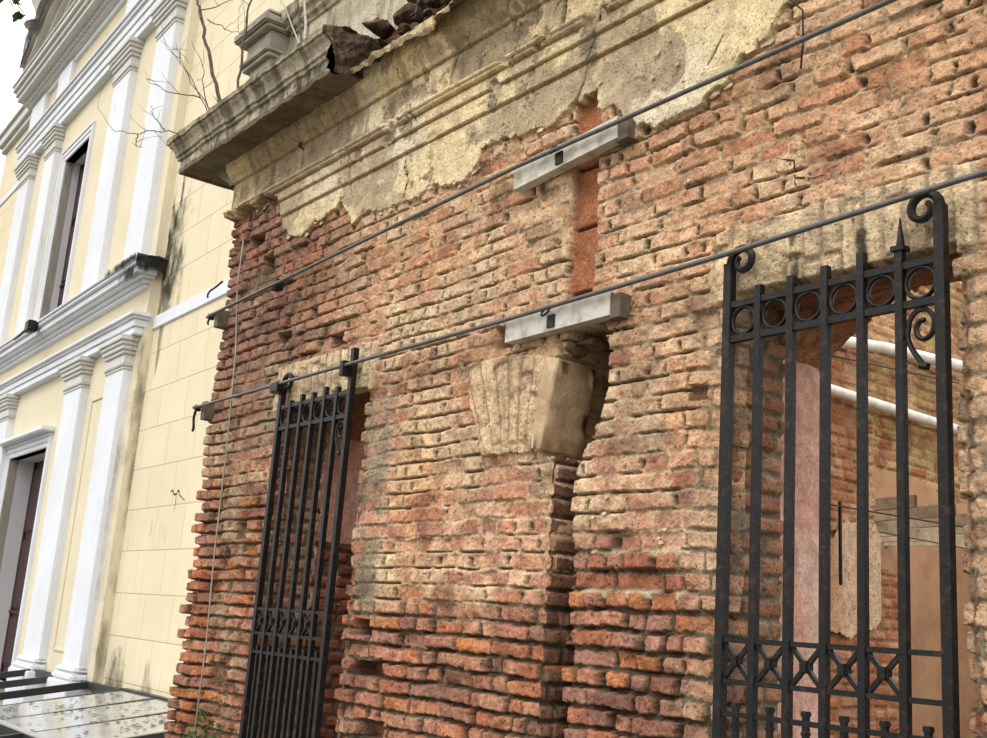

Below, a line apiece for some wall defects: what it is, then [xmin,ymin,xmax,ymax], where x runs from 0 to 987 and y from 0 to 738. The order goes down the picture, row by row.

peeling [382,78,423,119]
peeling [225,100,571,279]
leakage [105,185,184,313]
spalling [277,329,293,346]
spalling [330,333,347,348]
spalling [493,324,517,352]
spalling [688,382,710,402]